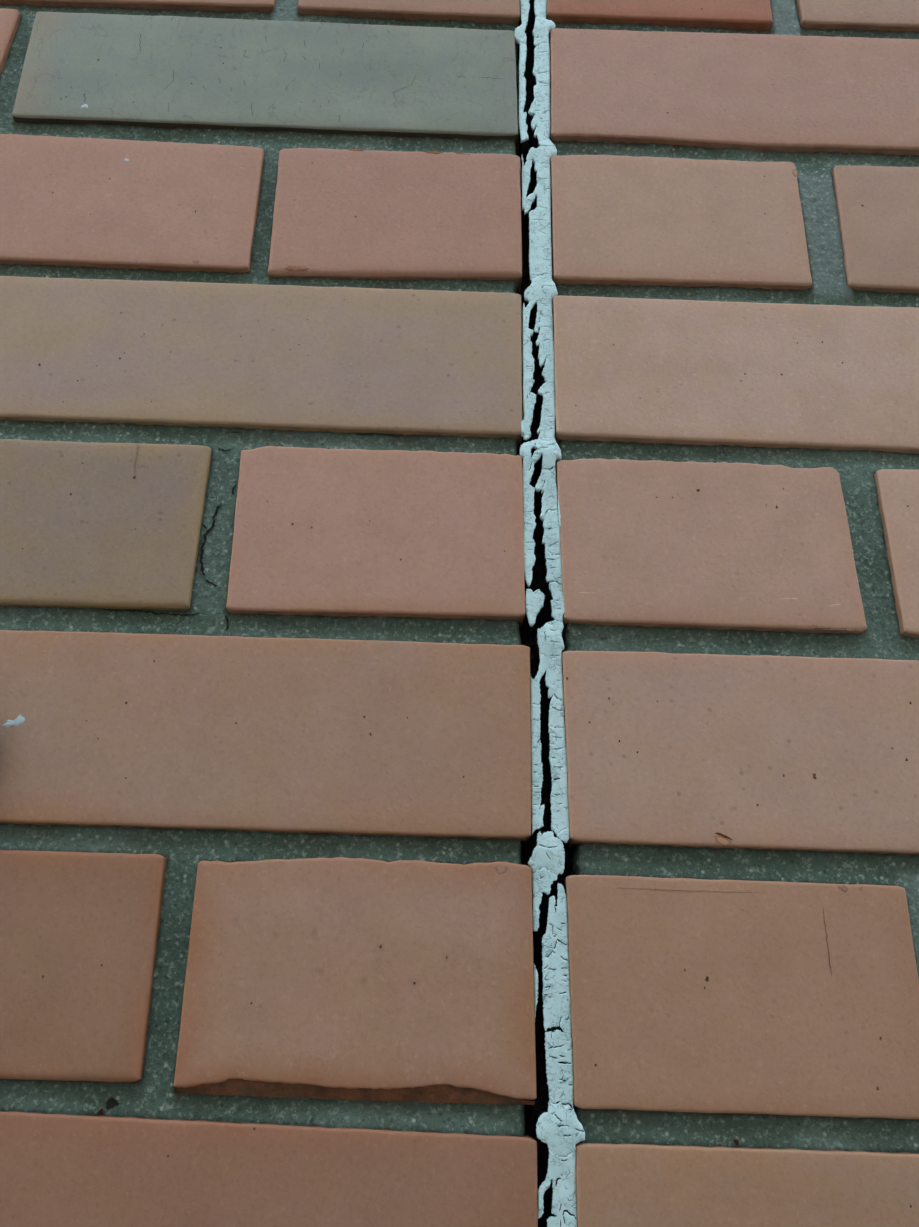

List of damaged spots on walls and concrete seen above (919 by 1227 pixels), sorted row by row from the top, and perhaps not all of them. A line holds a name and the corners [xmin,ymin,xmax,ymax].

crack [199,485,236,586]
crack [100,608,229,631]
crack [457,0,585,1227]